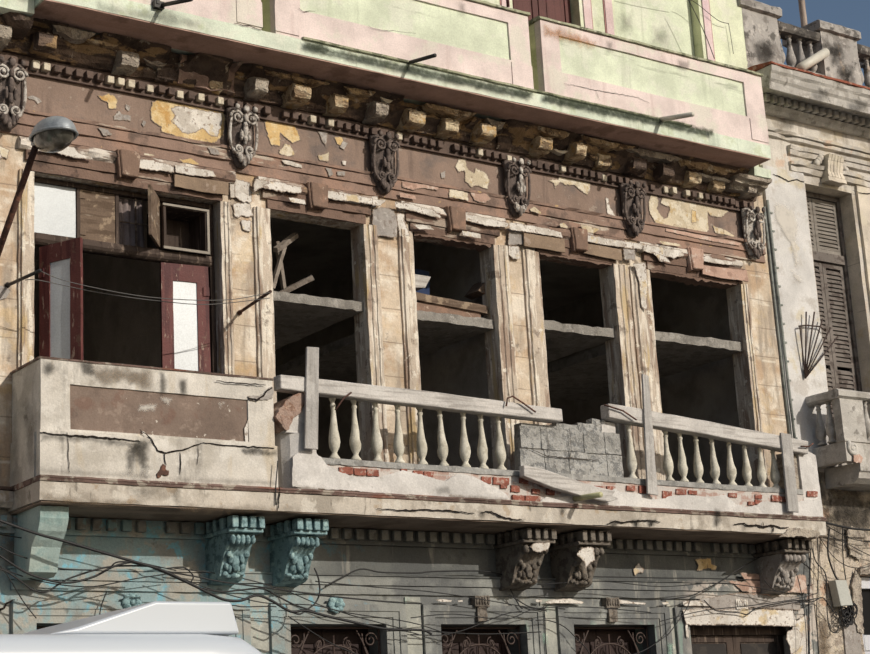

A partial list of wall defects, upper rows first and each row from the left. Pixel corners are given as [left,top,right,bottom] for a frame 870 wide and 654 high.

damp [757,44,772,62]
peeling [265,121,302,168]
peeling [318,131,348,176]
peeling [140,153,306,232]
peeling [328,158,749,310]
damp [129,443,147,465]
crack [40,430,274,473]
flaking render [338,467,379,477]
flaking render [481,476,555,502]
peeling [577,547,595,568]
peeling [695,558,717,571]